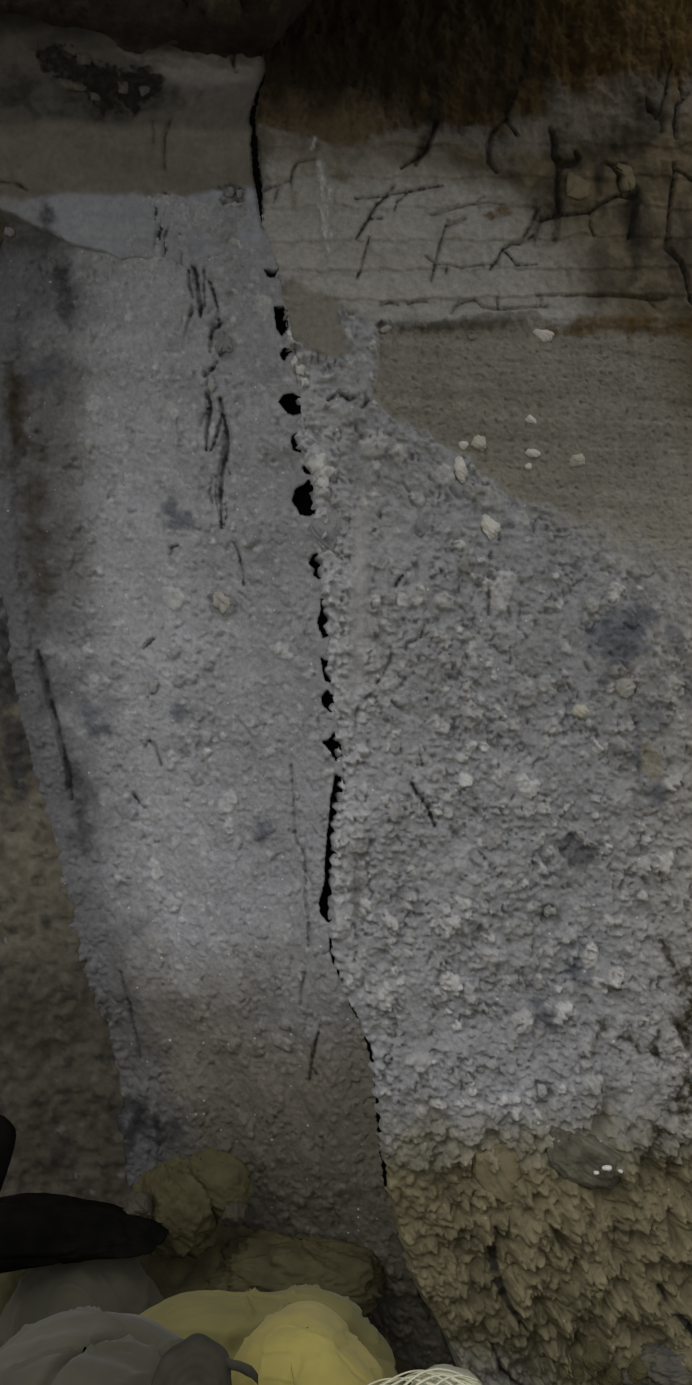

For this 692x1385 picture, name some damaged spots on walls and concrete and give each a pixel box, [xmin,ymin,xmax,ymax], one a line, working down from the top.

crack [233,54,265,224]
crack [646,63,685,131]
crack [355,123,439,277]
crack [492,131,692,305]
crack [264,269,292,360]
spalling [286,330,310,389]
crack [278,393,349,516]
spalling [309,452,335,488]
crack [309,554,387,1192]
crack [411,783,436,827]
spalling [554,830,597,868]